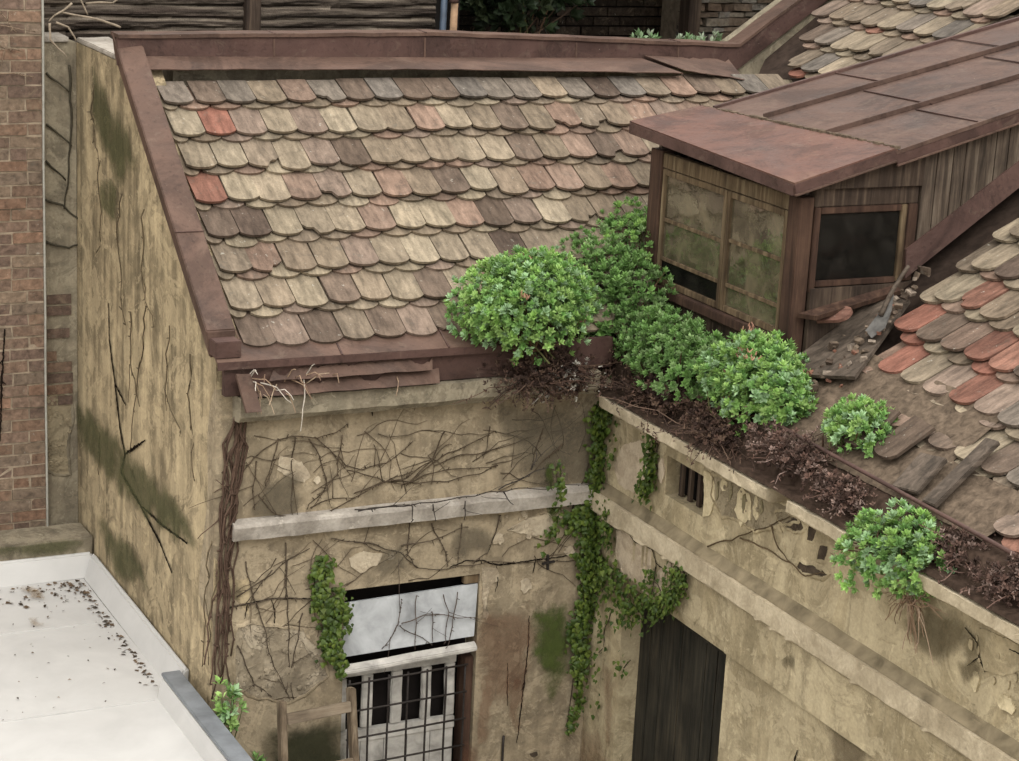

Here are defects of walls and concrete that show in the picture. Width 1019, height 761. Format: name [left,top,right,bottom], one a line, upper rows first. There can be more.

crack [0,329,8,441]
spalling [703,471,833,582]
flaking render [968,628,1019,715]